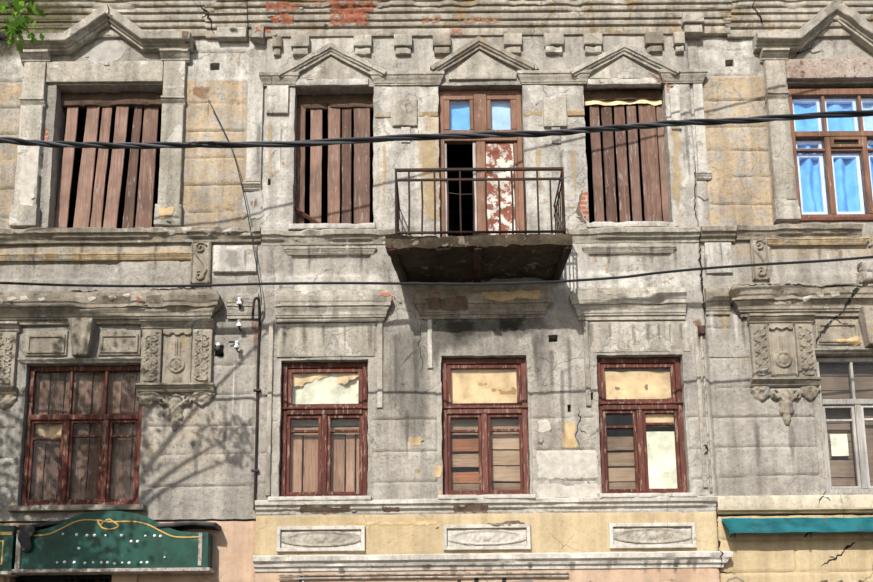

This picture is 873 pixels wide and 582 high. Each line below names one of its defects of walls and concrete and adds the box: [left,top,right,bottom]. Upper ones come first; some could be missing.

spalling [255,0,388,36]
spalling [576,189,589,223]
crack [694,161,709,328]
damp [436,316,539,345]
crack [737,283,868,347]
spalling [536,419,604,499]
peeling [300,505,444,528]
peeling [453,504,529,526]
crack [823,542,856,565]